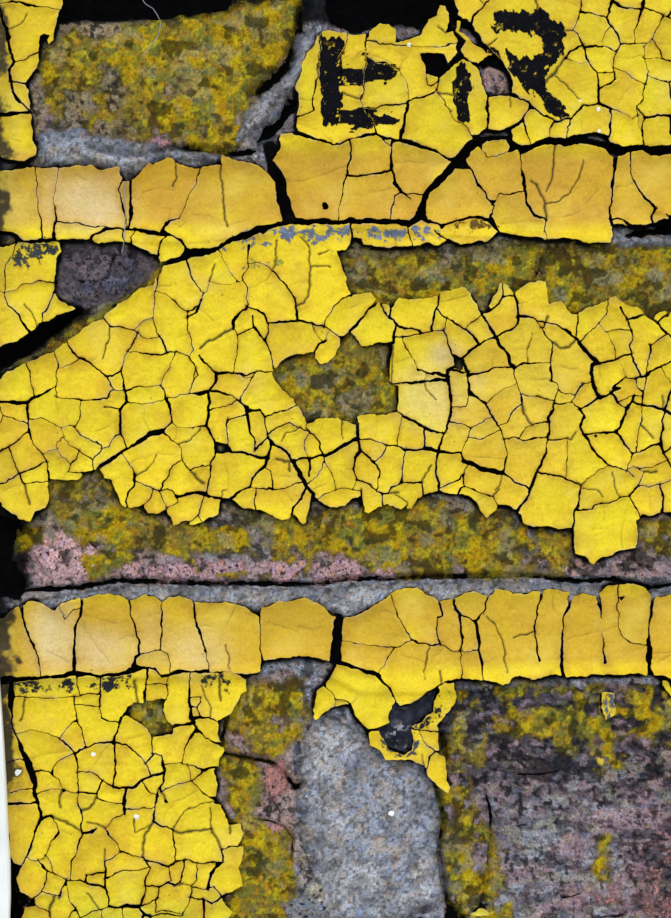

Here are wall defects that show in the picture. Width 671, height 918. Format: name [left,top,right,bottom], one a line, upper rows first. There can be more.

crack [0,0,671,520]
peeling [0,0,671,564]
crack [110,848,224,918]
peeling [0,583,671,918]
crack [2,573,671,868]